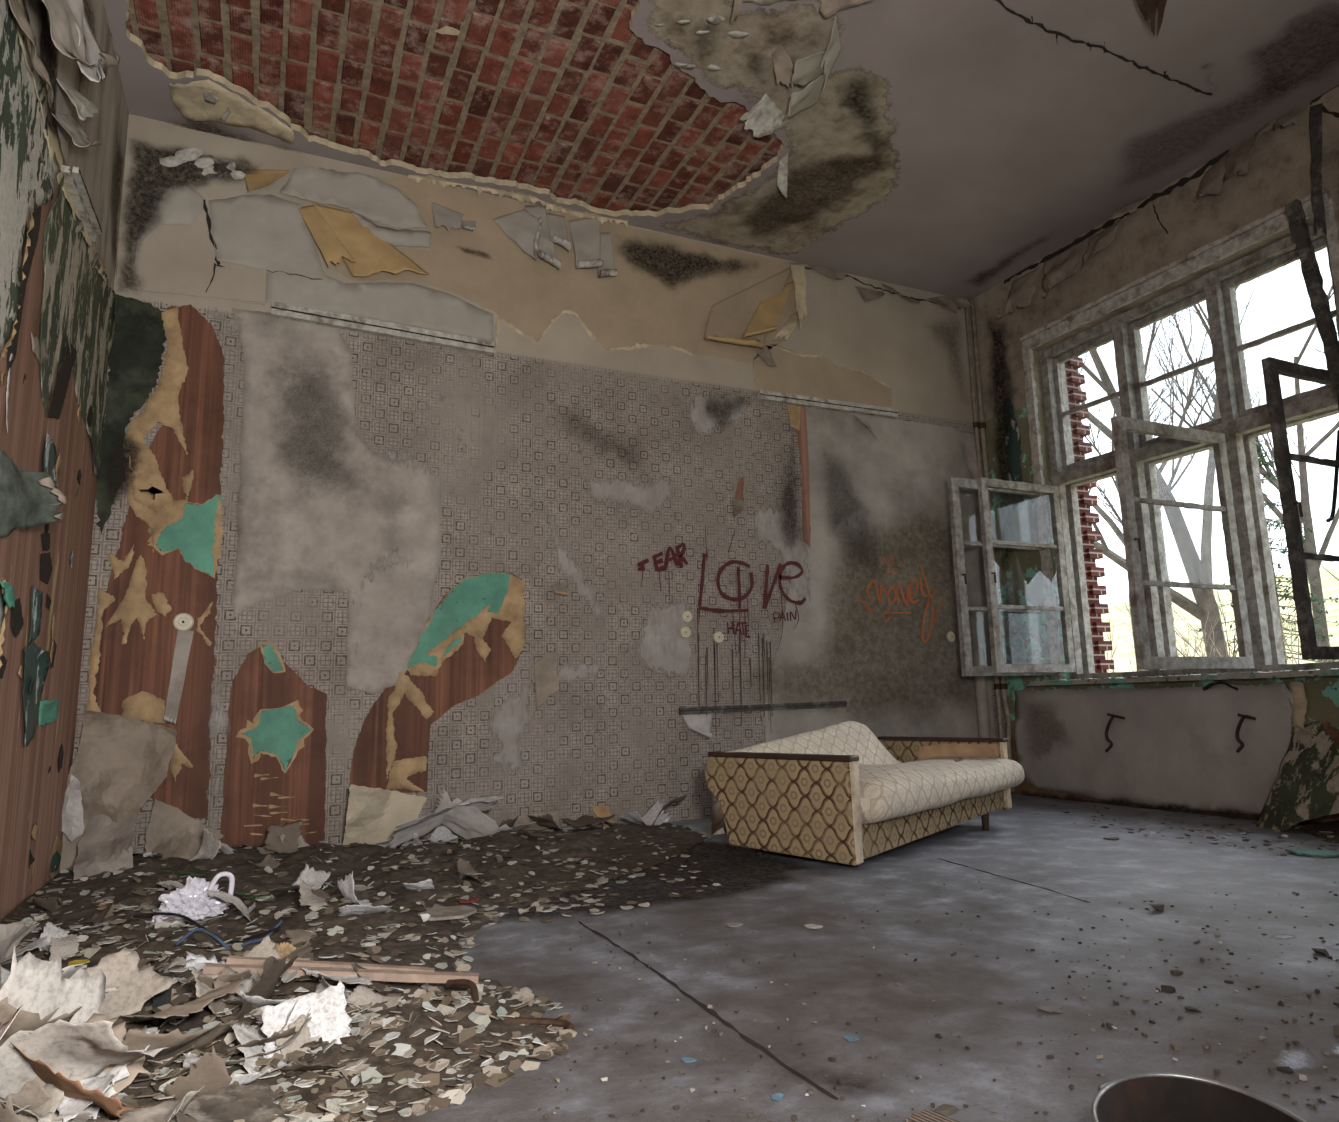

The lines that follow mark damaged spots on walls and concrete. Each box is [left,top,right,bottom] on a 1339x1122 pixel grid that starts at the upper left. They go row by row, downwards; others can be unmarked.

crack [995,0,1213,96]
water stain [846,81,878,144]
crack [1310,85,1339,118]
peeling [0,0,167,534]
crack [203,199,225,292]
spalling [126,0,974,367]
mould [624,244,743,286]
water stain [744,160,873,235]
crack [1004,149,1229,284]
peeling [0,578,8,668]
peeling [163,630,194,725]
crack [579,922,839,1100]